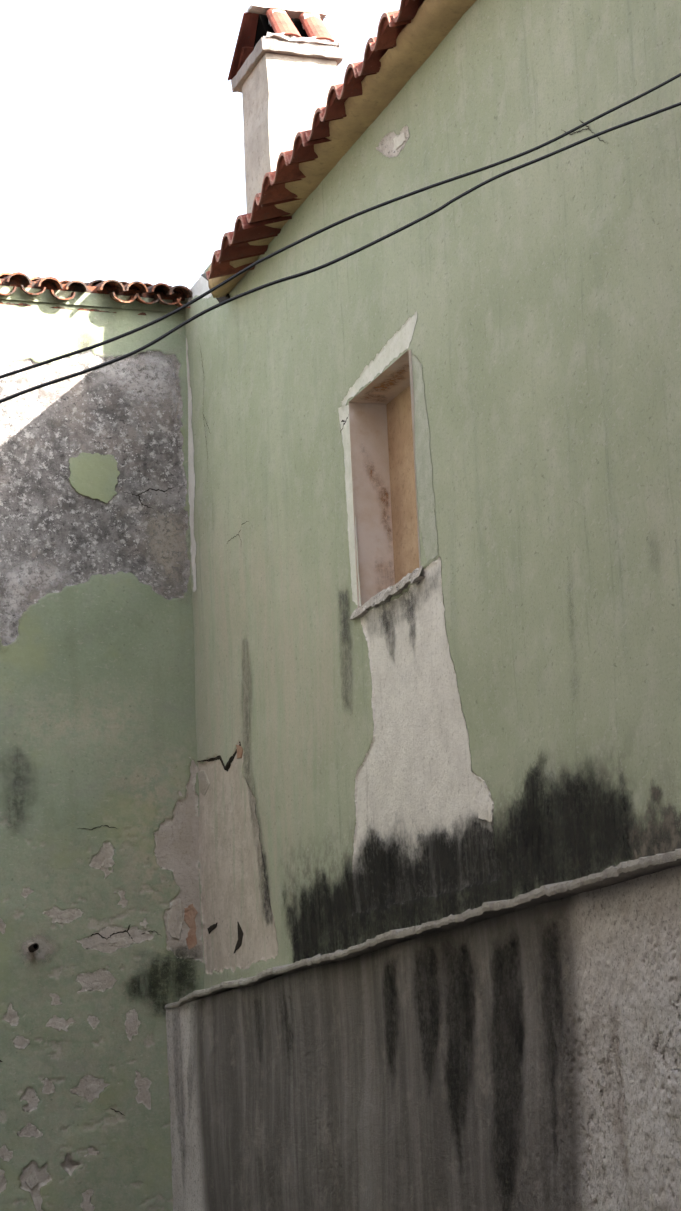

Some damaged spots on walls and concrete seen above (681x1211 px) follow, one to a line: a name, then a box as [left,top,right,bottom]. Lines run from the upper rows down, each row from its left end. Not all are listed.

peeling [0,336,197,646]
peeling [76,741,278,975]
peeling [22,935,53,961]
spalling [46,993,100,1032]
spalling [76,969,117,994]
water stain [286,759,681,1144]
spalling [0,1144,99,1211]